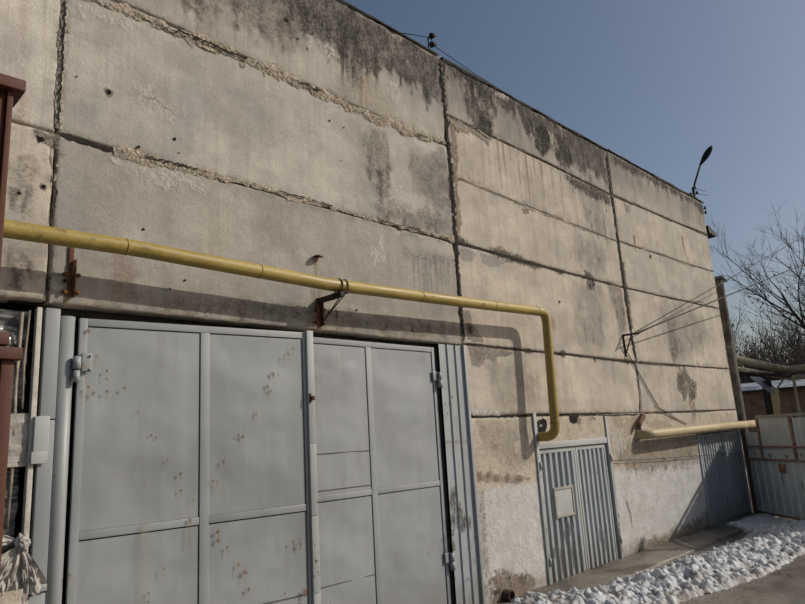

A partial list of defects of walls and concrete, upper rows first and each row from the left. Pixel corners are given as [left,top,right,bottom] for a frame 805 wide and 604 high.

spalling [34,0,70,148]
crack [48,137,69,226]
spalling [84,0,490,297]
crack [46,245,56,303]
peeling [460,307,513,367]
damp [677,367,697,405]